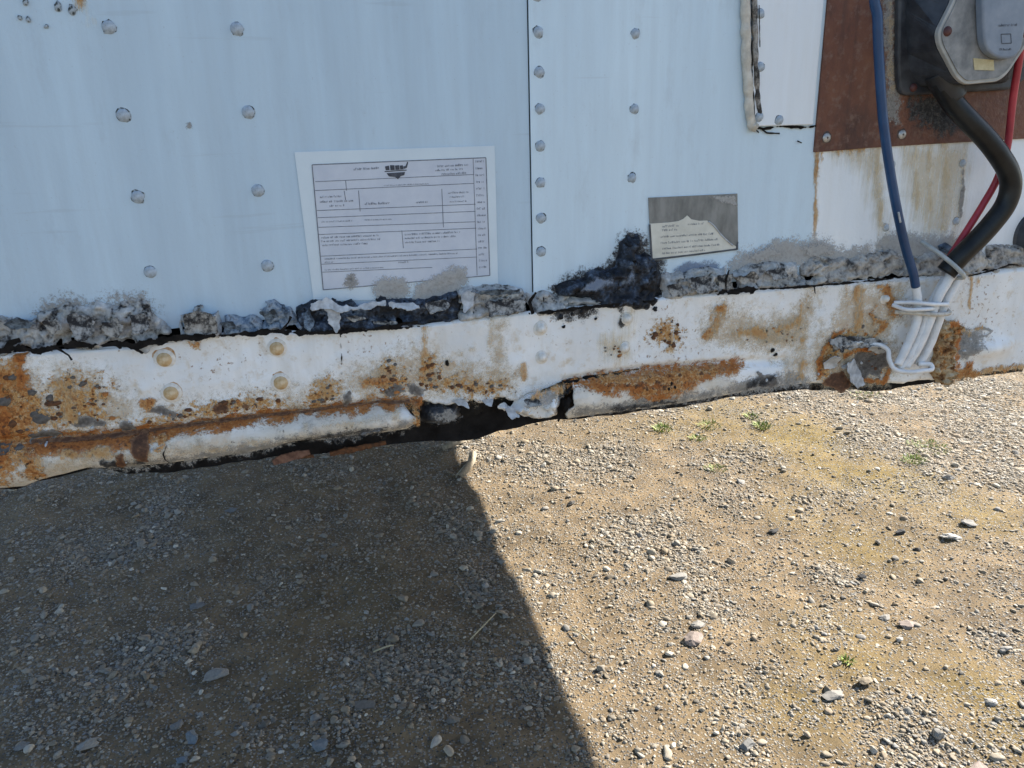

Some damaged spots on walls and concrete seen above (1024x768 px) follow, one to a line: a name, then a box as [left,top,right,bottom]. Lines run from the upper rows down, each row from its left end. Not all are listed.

peeling [667,282,688,298]
peeling [717,268,789,292]
peeling [3,317,36,330]
peeling [102,313,181,354]
peeling [259,309,279,323]
peeling [302,308,314,332]
peeling [324,289,520,333]
rust [701,301,729,341]
rust [732,299,809,356]
rust [797,282,903,386]
rust [929,319,1024,385]
rust [0,324,745,487]